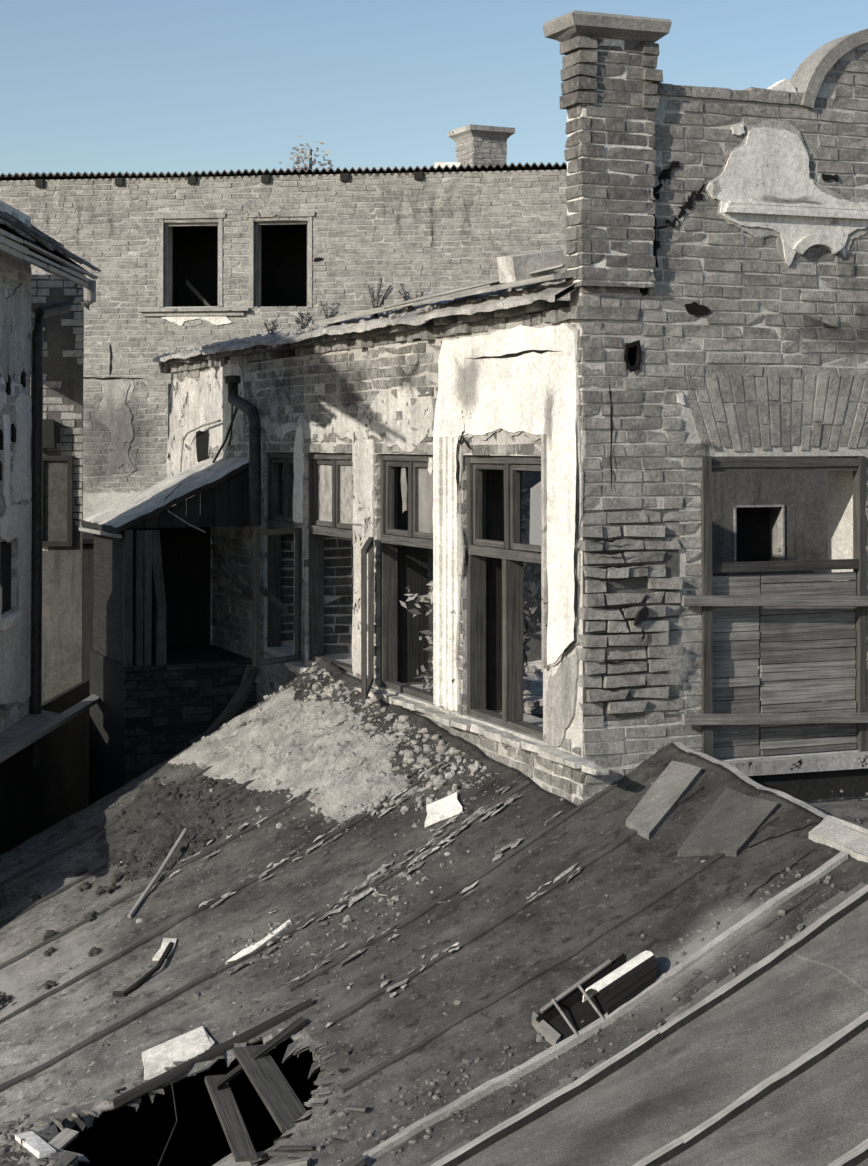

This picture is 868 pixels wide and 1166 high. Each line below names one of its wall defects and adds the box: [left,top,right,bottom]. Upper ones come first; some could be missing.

crack [653,161,706,269]
flaking render [706,119,868,267]
crack [470,350,551,359]
spalling [624,340,642,373]
spalling [685,301,711,315]
flaking render [0,283,32,715]
flaking render [166,317,583,747]
crack [556,410,578,666]
crack [607,376,615,490]
crack [671,821,821,997]